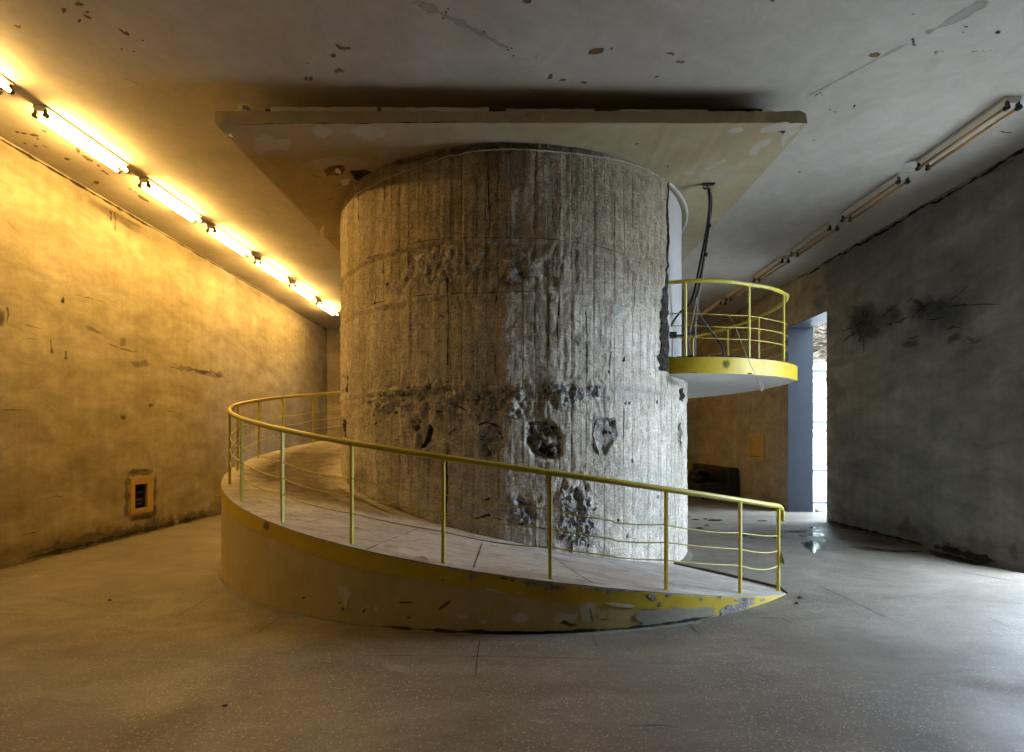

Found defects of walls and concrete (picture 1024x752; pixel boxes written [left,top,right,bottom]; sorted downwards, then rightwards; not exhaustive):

spalling [657,184,670,372]
spalling [364,379,603,461]
spalling [592,417,618,456]
spalling [557,481,600,548]
peeling [485,577,766,627]